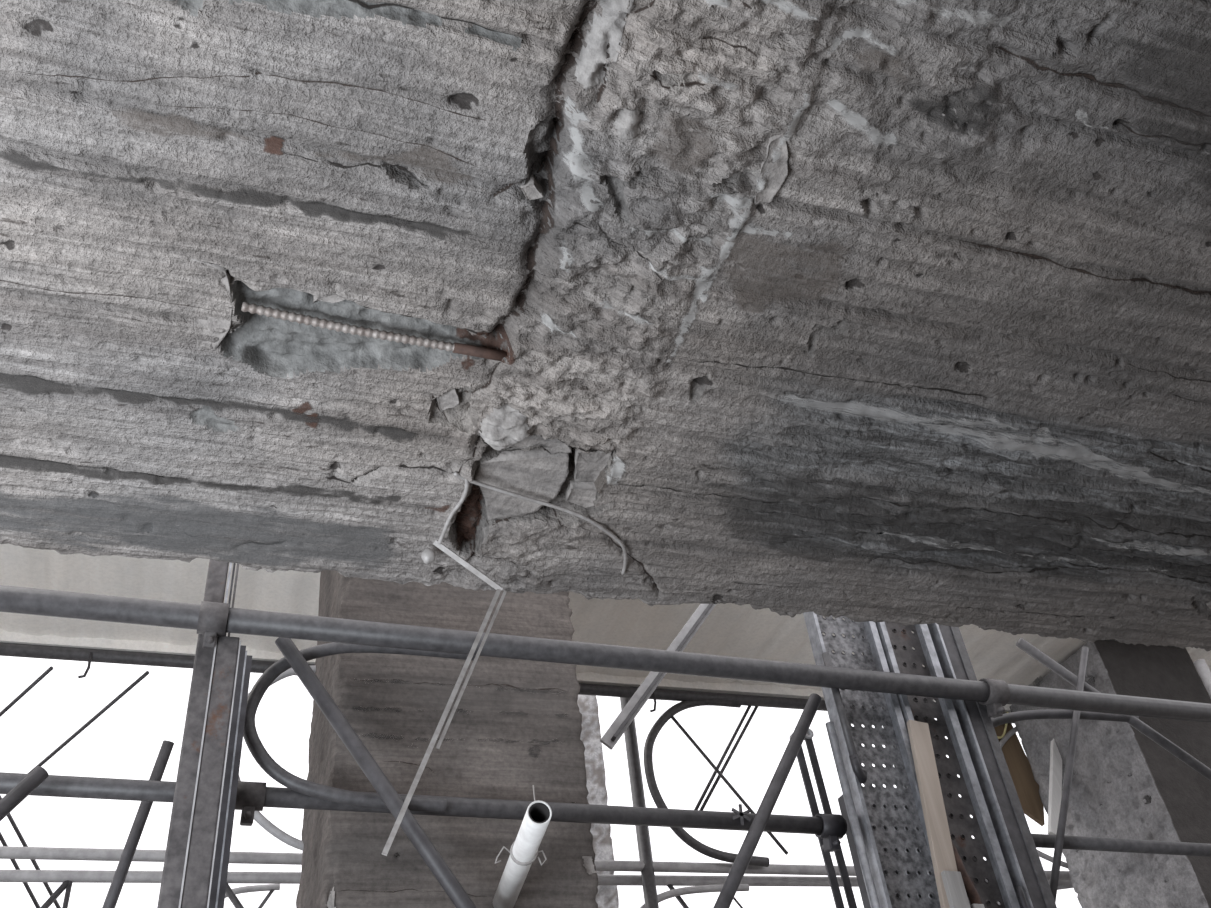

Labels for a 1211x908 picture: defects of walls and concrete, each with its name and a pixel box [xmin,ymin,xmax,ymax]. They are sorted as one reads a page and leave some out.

crack [349,0,518,38]
crack [15,71,489,186]
spalling [520,114,562,208]
crack [466,0,662,335]
spalling [712,134,788,214]
spalling [191,258,516,378]
leakage [632,181,791,363]
crack [325,428,517,565]
corrosion [425,485,482,554]
spalling [448,435,617,558]
leakage [607,457,625,484]
leakage [779,395,1211,493]